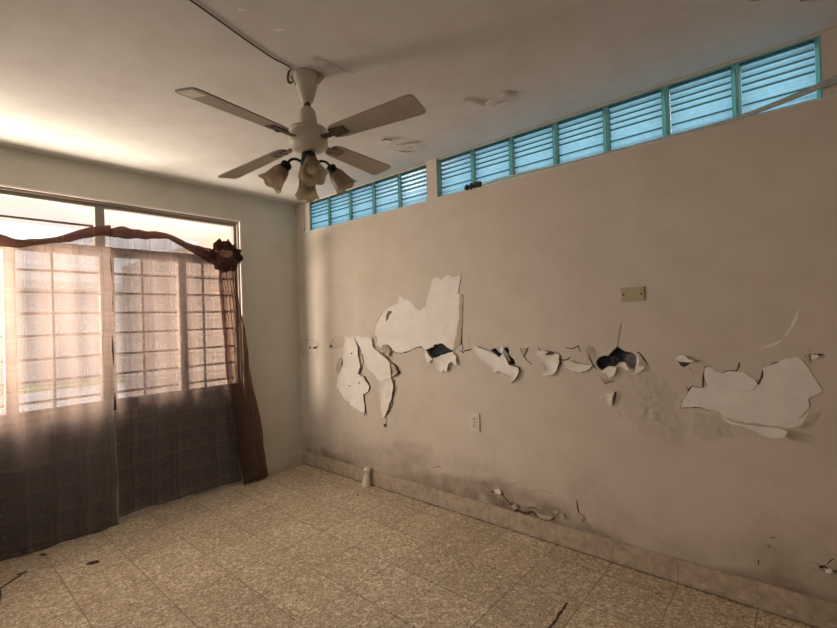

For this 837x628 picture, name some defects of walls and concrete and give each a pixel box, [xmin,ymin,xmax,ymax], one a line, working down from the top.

peeling [336,274,463,427]
peeling [471,345,521,383]
spalling [536,323,649,384]
peeling [675,348,825,438]